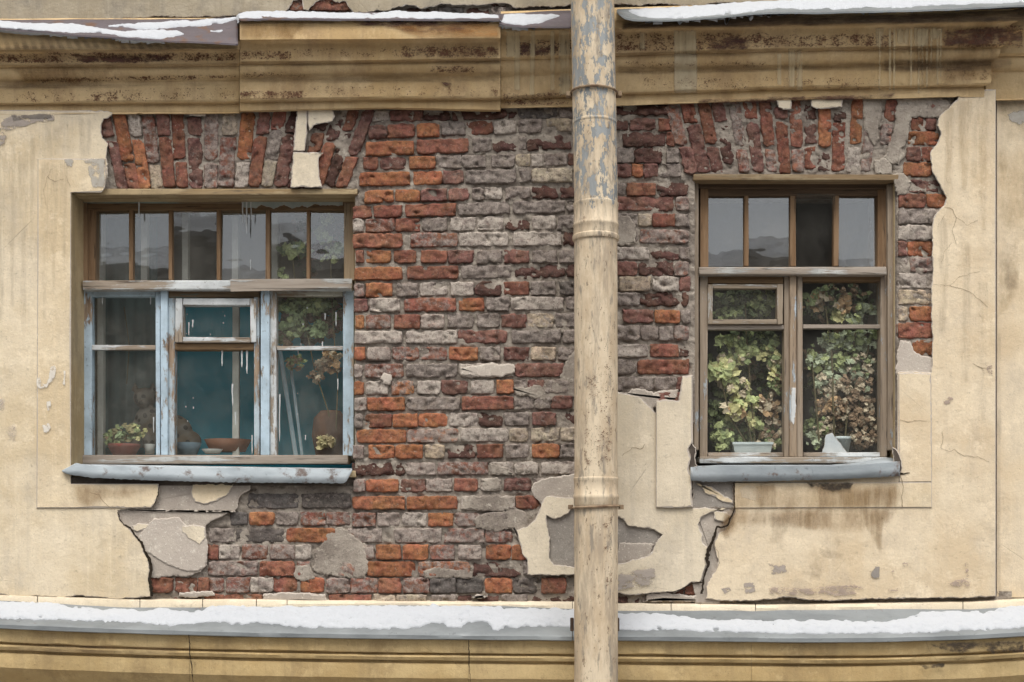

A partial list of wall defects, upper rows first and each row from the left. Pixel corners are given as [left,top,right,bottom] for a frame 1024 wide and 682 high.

corrosion [0,40,571,105]
corrosion [616,32,894,103]
corrosion [942,25,1023,48]
peeling [0,114,54,146]
spalling [616,98,954,424]
spalling [65,107,574,605]
damp [808,482,853,491]
crack [673,484,735,594]
spalling [618,481,1012,606]